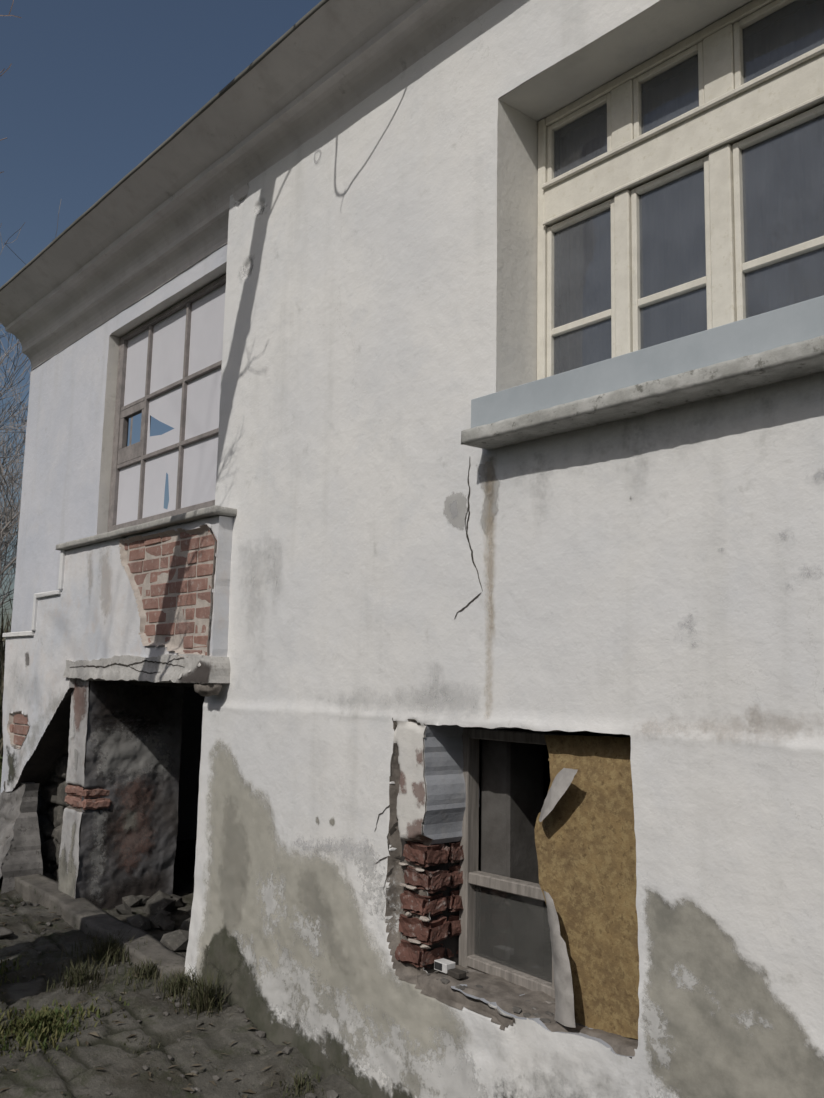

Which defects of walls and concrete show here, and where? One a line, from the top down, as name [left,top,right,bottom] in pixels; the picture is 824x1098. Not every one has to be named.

flaking render [7,710,31,757]
peeling [64,682,171,896]
crack [70,658,184,674]
flaking render [119,522,217,684]
peeling [389,721,431,851]
crack [454,458,483,619]
water stain [196,742,465,1065]
water stain [642,890,824,1098]